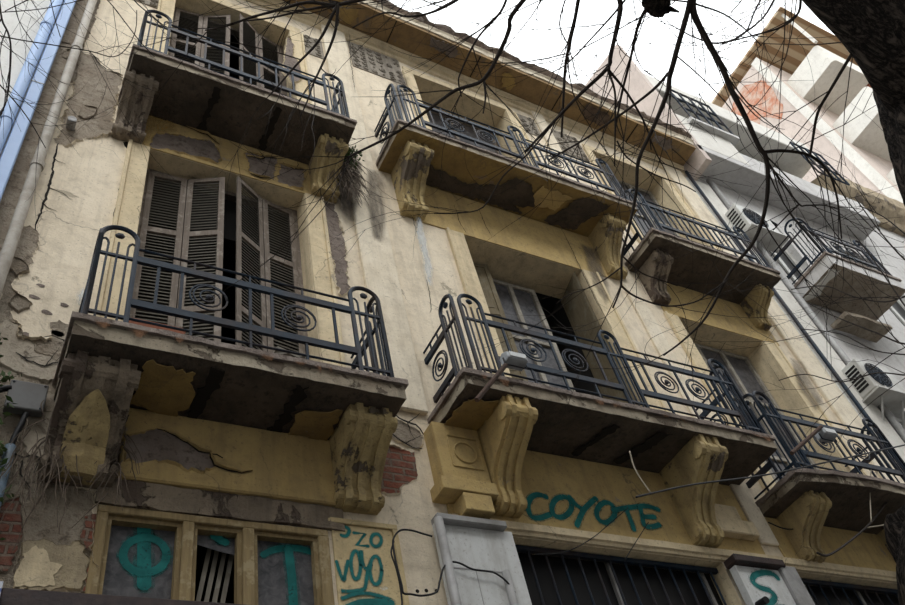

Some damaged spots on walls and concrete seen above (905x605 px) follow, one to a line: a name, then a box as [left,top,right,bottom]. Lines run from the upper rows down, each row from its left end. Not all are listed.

peeling [52,0,123,148]
spalling [148,87,222,165]
crack [35,143,69,230]
spalling [426,164,610,230]
peeling [0,225,99,593]
peeling [130,359,225,419]
spalling [122,428,216,474]
flaking render [381,419,424,496]